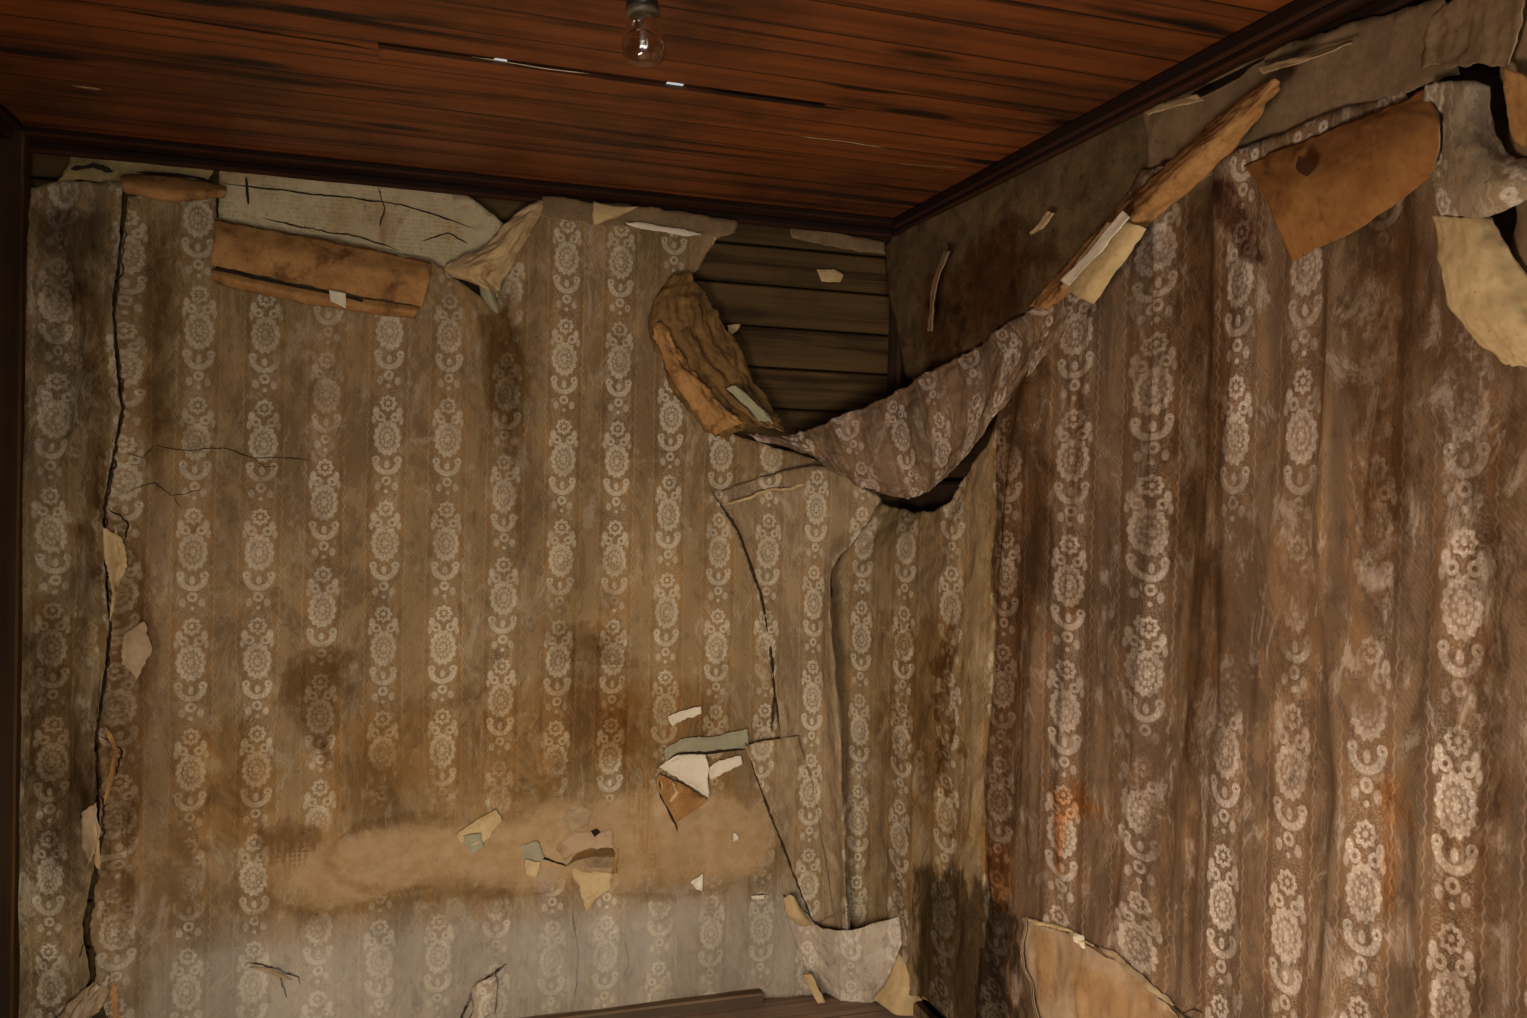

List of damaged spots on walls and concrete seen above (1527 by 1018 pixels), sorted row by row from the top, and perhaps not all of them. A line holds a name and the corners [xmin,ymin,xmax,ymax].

peeling [656,706,749,833]
peeling [455,810,502,854]
damp [284,791,773,904]
peeling [520,830,619,911]
peeling [691,873,703,891]
damp [917,872,1017,1018]
peeling [1023,917,1178,1018]